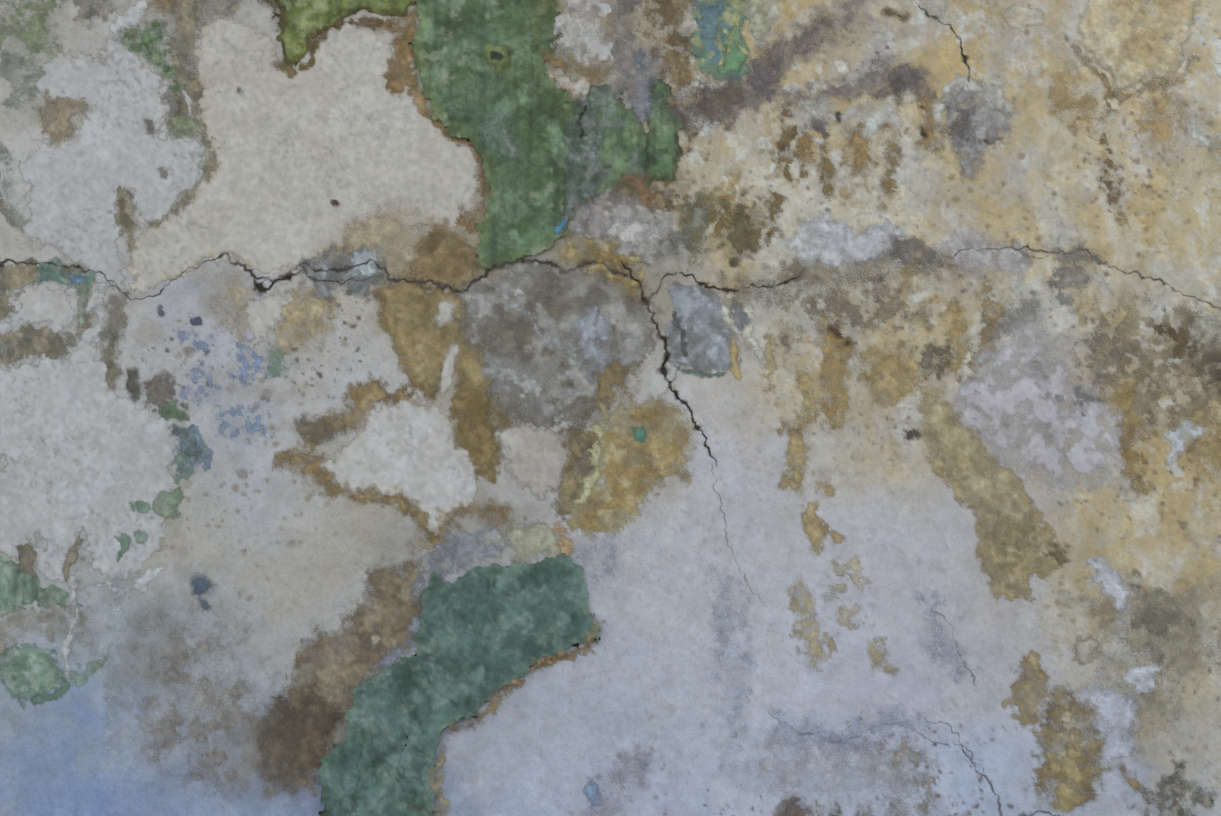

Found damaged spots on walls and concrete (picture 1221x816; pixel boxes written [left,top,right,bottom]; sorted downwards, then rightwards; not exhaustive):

peeling [0,0,616,582]
crack [0,208,799,598]
crack [945,245,1221,310]
peeling [317,553,601,816]
crack [769,713,1060,816]